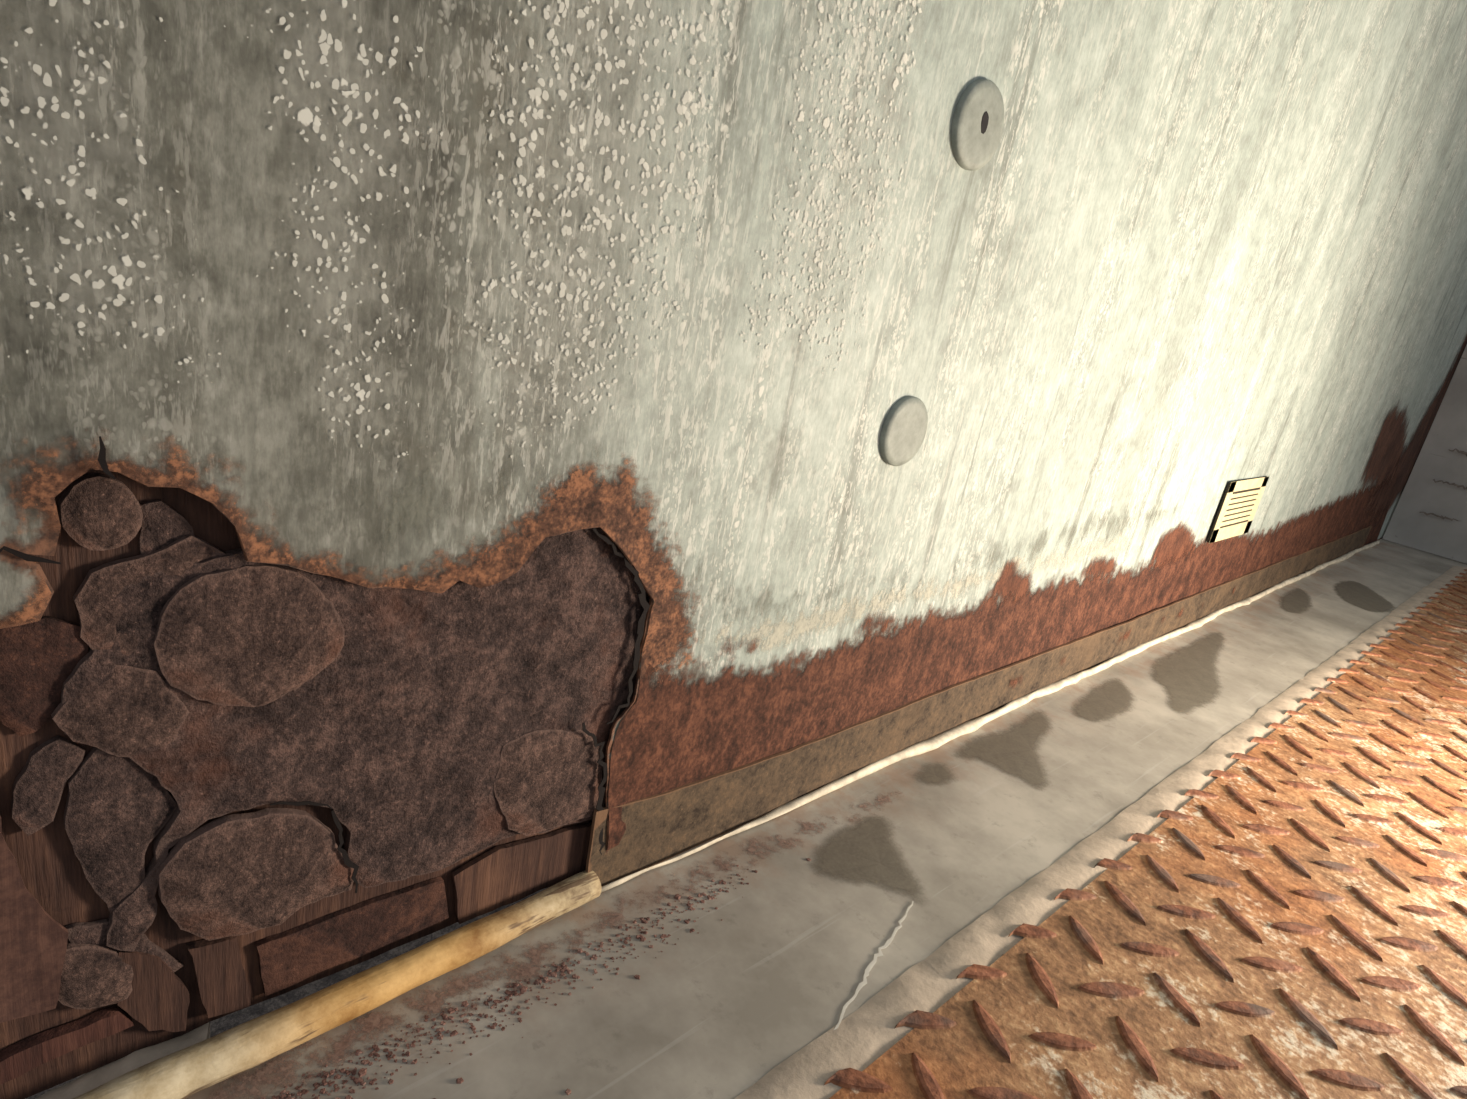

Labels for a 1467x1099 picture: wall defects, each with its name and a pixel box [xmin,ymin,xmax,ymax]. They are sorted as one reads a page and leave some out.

leakage [1281,589,1311,613]
leakage [1335,581,1393,612]
corrosion [0,335,1467,1010]
leakage [1074,680,1133,721]
leakage [1154,633,1224,712]
leakage [919,712,1050,787]
leakage [814,817,919,898]
corrosion [209,793,892,1099]